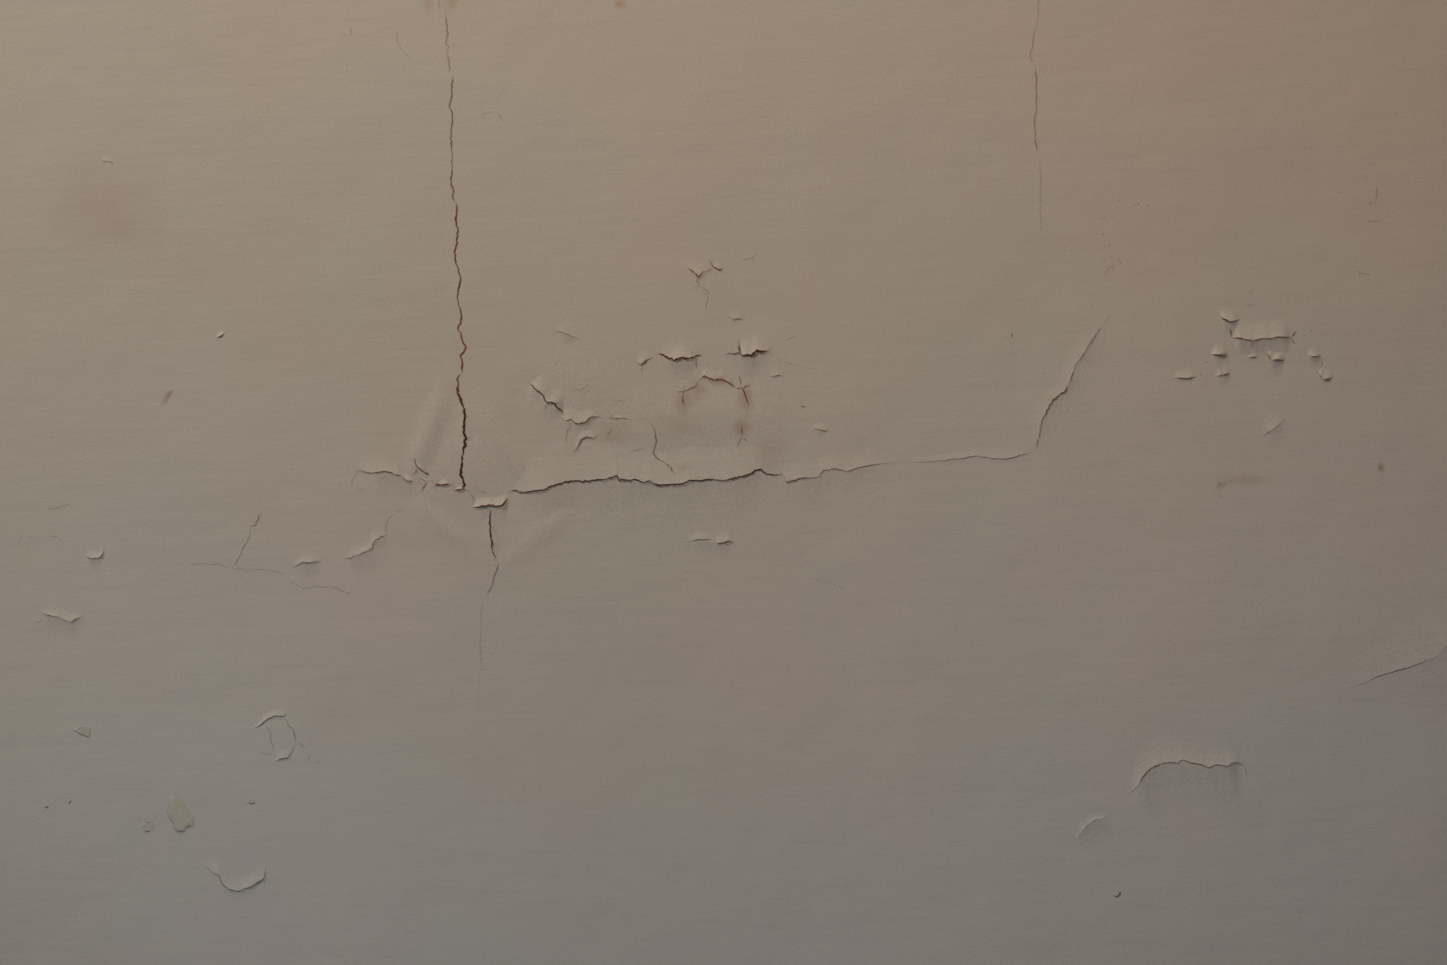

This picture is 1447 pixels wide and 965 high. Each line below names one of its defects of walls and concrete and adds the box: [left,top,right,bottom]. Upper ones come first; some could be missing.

crack [438,2,473,488]
crack [686,259,723,297]
peeling [523,375,627,449]
peeling [635,329,773,403]
crack [1029,324,1106,451]
peeling [1211,307,1334,388]
crack [478,378,908,592]
crack [1339,604,1447,706]
peeling [1126,734,1244,825]